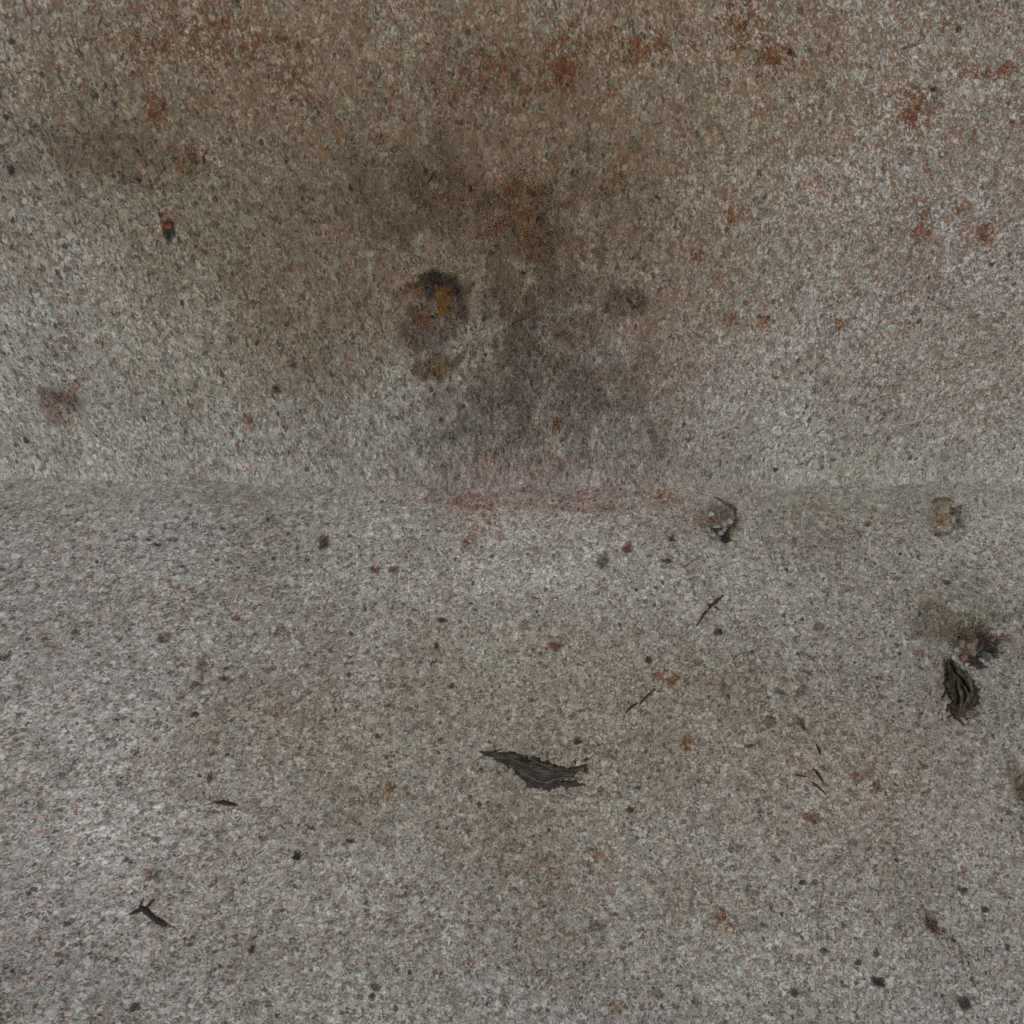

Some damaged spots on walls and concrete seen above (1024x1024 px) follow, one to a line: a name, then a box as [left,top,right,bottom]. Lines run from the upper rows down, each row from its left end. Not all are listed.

water stain [453,175,623,529]